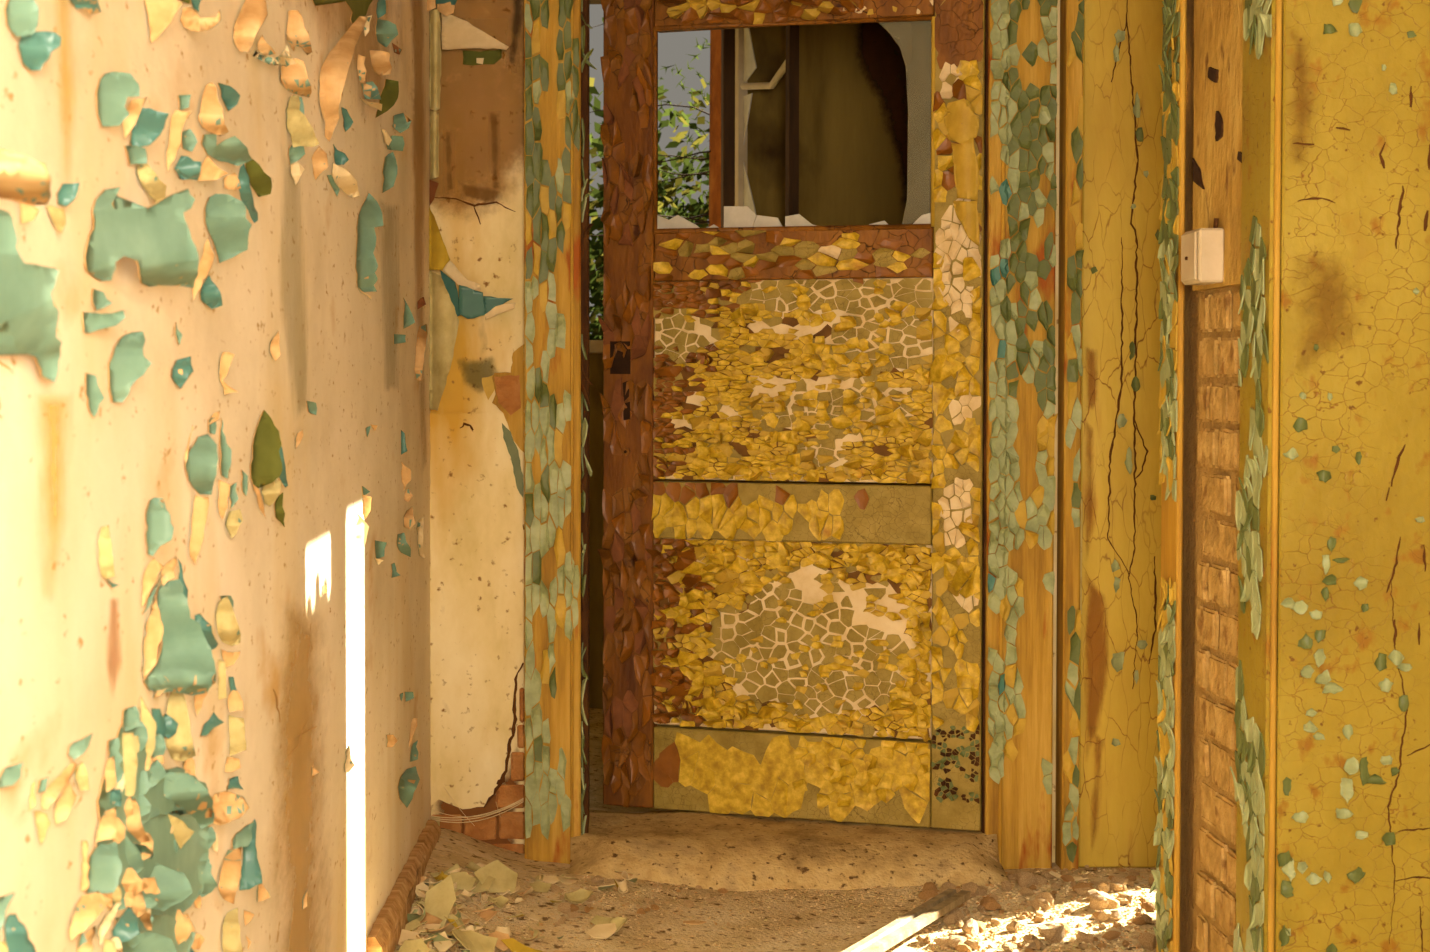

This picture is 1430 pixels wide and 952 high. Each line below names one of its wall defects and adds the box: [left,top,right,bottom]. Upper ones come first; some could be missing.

peeling [0,148,80,383]
peeling [0,352,303,952]
peeling [82,71,272,418]
peeling [145,0,412,300]
crack [483,663,524,808]
peeling [393,0,1098,928]
crack [1107,0,1157,689]
flaking render [1195,216,1369,952]
crack [1298,196,1335,204]
crack [1386,444,1406,501]
crack [1379,142,1430,249]
crack [1386,537,1430,952]